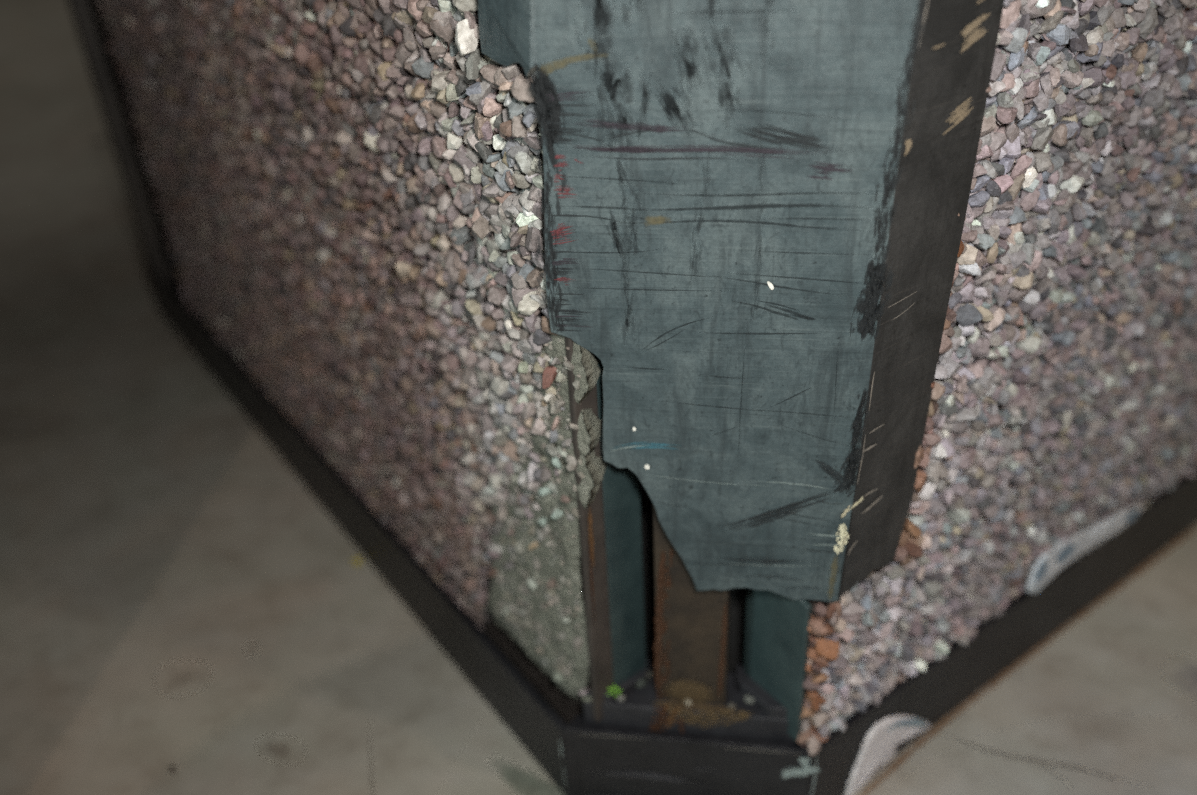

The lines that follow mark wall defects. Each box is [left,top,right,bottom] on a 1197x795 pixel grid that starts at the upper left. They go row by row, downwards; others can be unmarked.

rust [654,545,727,700]